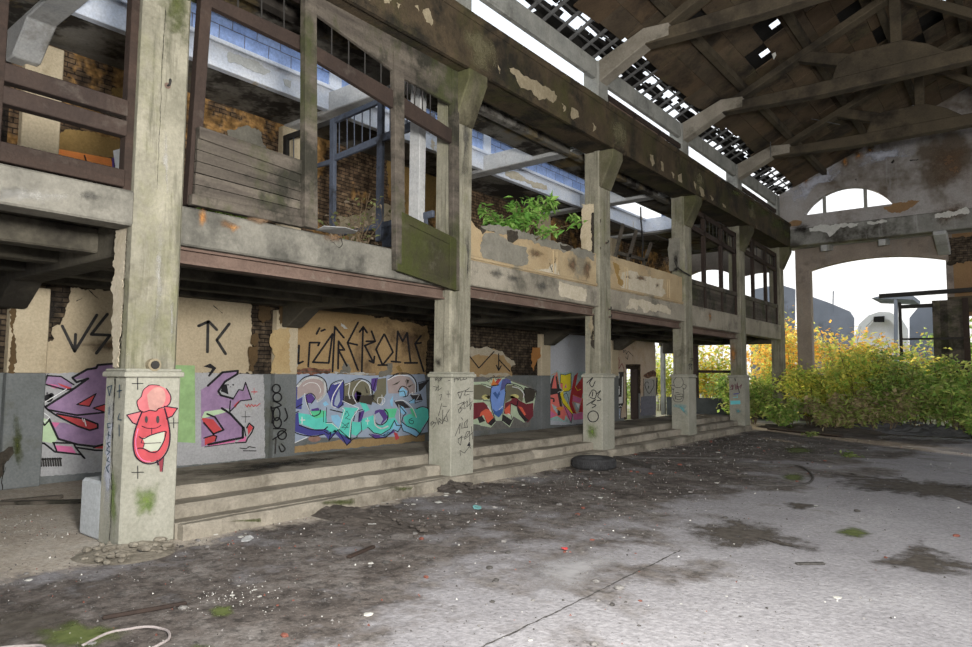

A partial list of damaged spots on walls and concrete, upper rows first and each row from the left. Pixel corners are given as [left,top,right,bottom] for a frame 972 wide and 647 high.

peeling [415,5,433,26]
peeling [498,65,579,119]
spalling [507,230,518,243]
spalling [591,213,601,253]
peeling [789,200,920,237]
peeling [935,207,970,218]
spalling [947,236,972,266]
spalling [110,227,127,368]
peeling [621,270,671,315]
spalling [0,447,14,478]